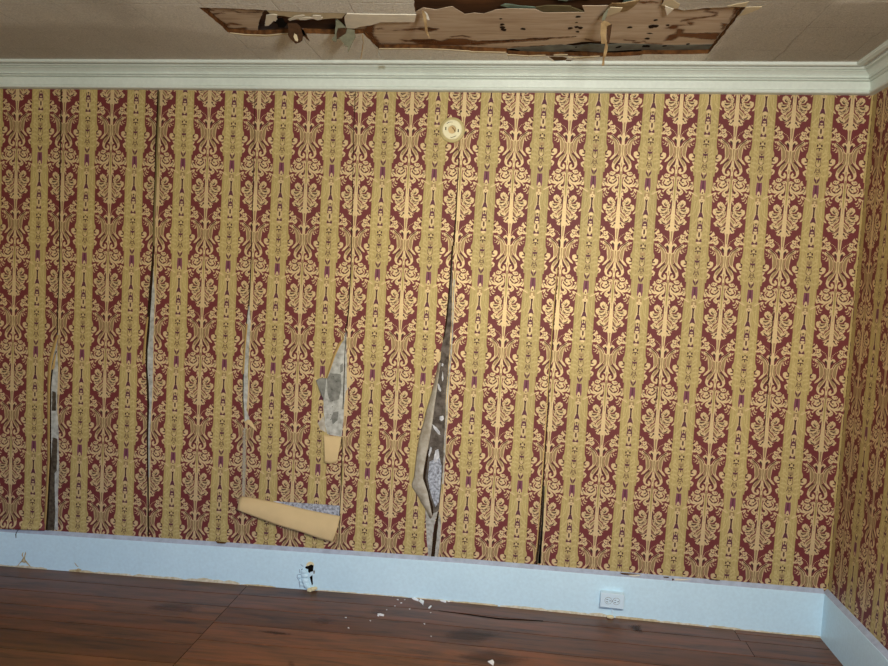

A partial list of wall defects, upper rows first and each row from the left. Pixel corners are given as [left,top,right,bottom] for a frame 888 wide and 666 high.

peeling [237,231,353,548]
peeling [412,153,459,557]
peeling [0,552,47,570]
peeling [69,563,274,587]
peeling [297,562,821,638]